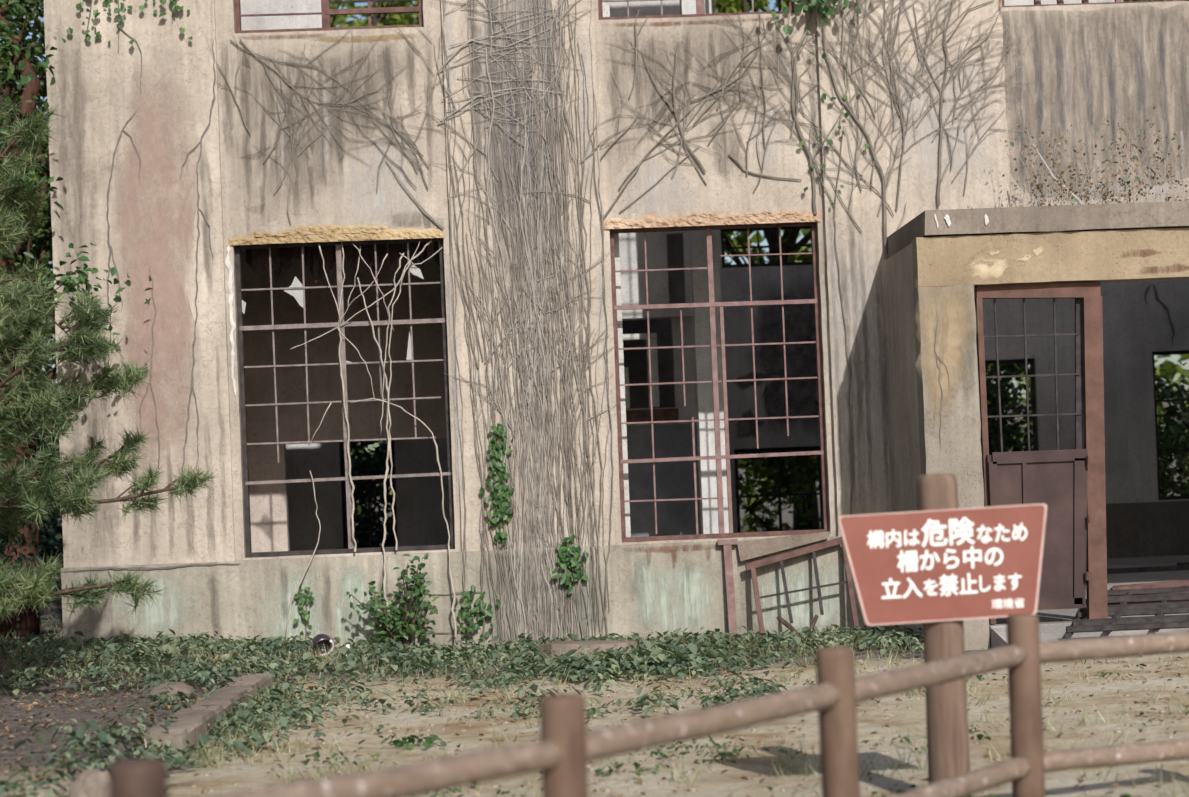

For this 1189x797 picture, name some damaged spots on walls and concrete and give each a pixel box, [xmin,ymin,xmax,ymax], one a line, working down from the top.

leakage [1016,16,1098,197]
leakage [1088,11,1189,191]
peeling [970,246,1044,280]
crack [1144,284,1175,346]